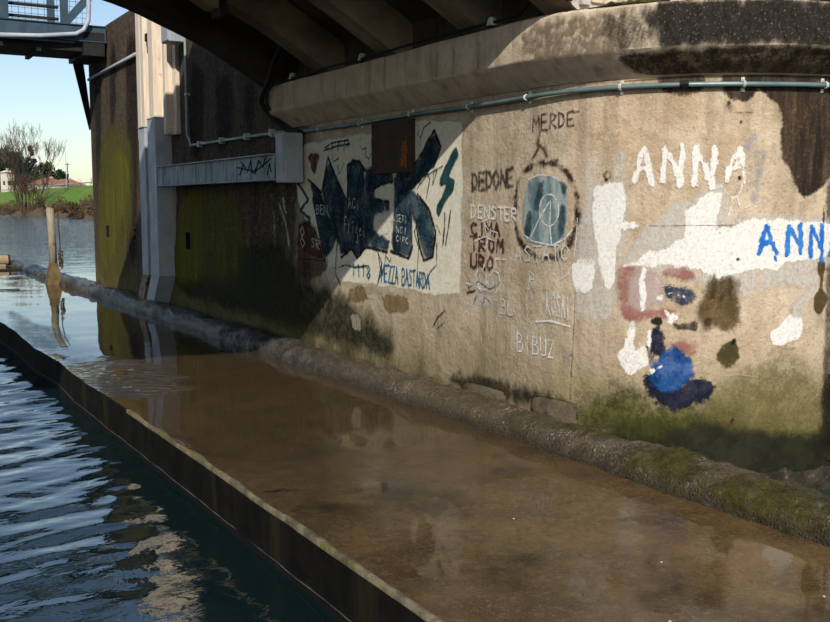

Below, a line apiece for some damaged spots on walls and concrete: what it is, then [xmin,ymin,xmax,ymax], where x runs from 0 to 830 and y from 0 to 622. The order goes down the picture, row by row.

water stain [94,38,138,281]
water stain [174,189,244,283]
water stain [522,6,830,224]
water stain [612,261,830,476]